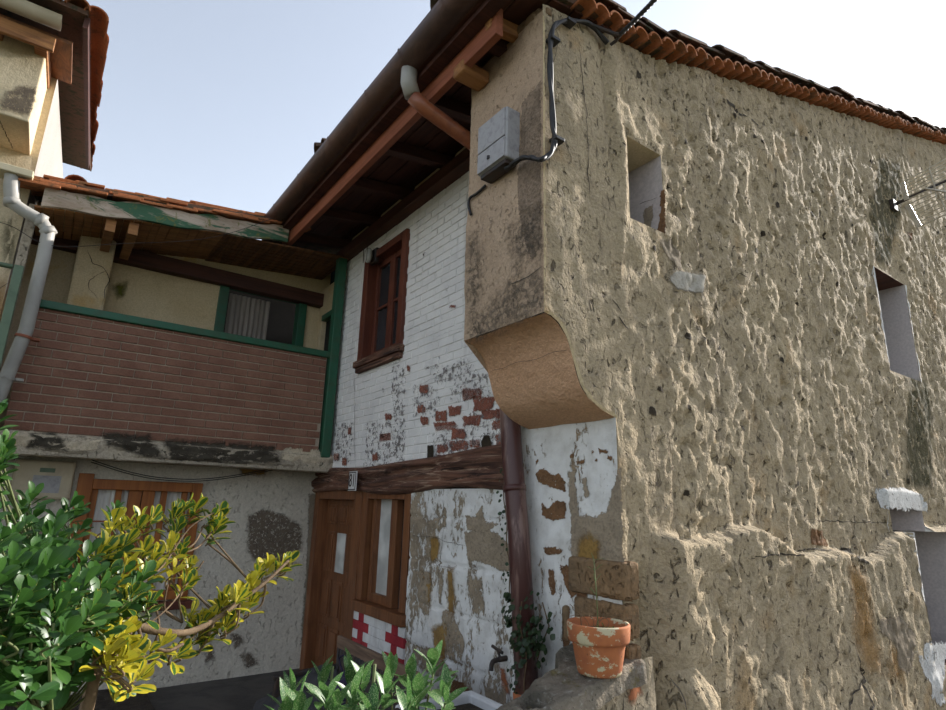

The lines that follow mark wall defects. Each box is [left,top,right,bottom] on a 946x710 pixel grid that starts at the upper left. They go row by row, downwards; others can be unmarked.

water stain [1,86,36,114]
peeling [412,357,501,458]
water stain [27,433,66,451]
water stain [102,432,280,463]
peeling [364,413,406,466]
water stain [247,510,302,564]
flaking render [464,506,509,572]
flaking render [536,448,625,619]
crack [748,548,837,559]
crack [810,517,893,525]
peeling [468,576,486,617]
peeling [412,568,469,694]